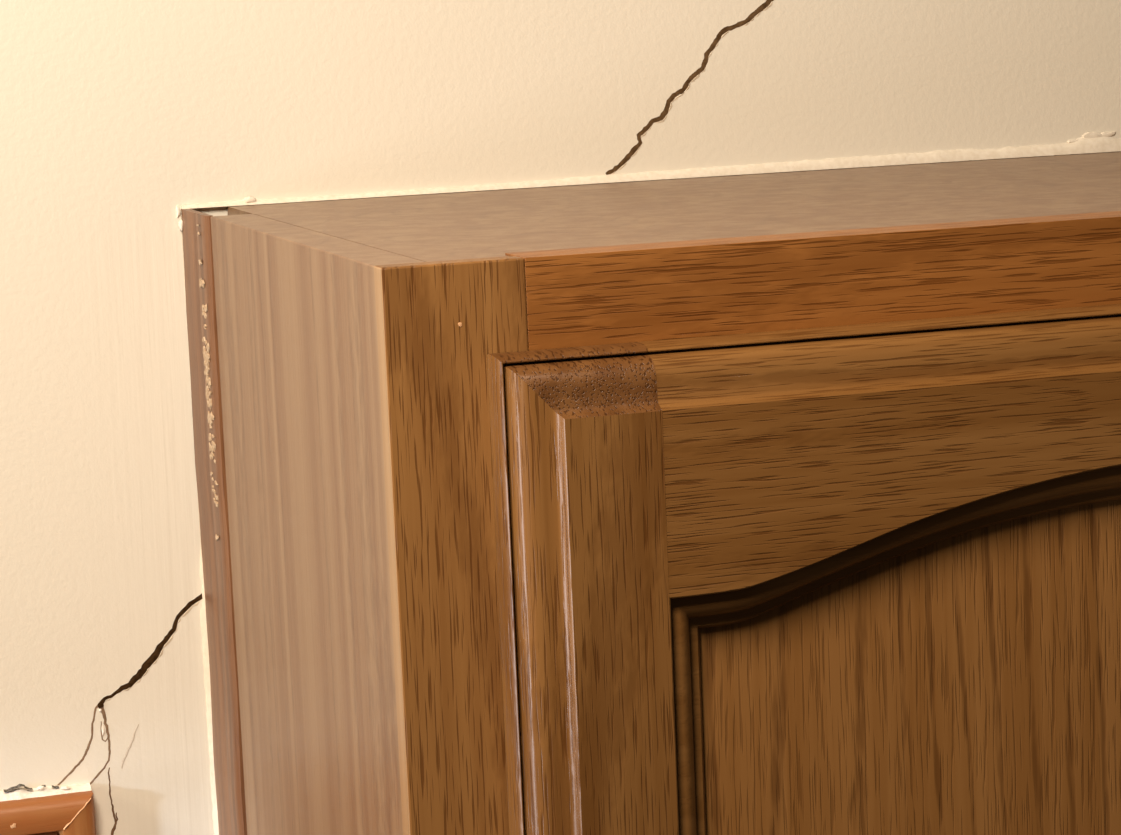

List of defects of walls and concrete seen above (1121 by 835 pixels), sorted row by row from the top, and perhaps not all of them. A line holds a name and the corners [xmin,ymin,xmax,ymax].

crack [606,0,774,175]
crack [58,594,202,835]